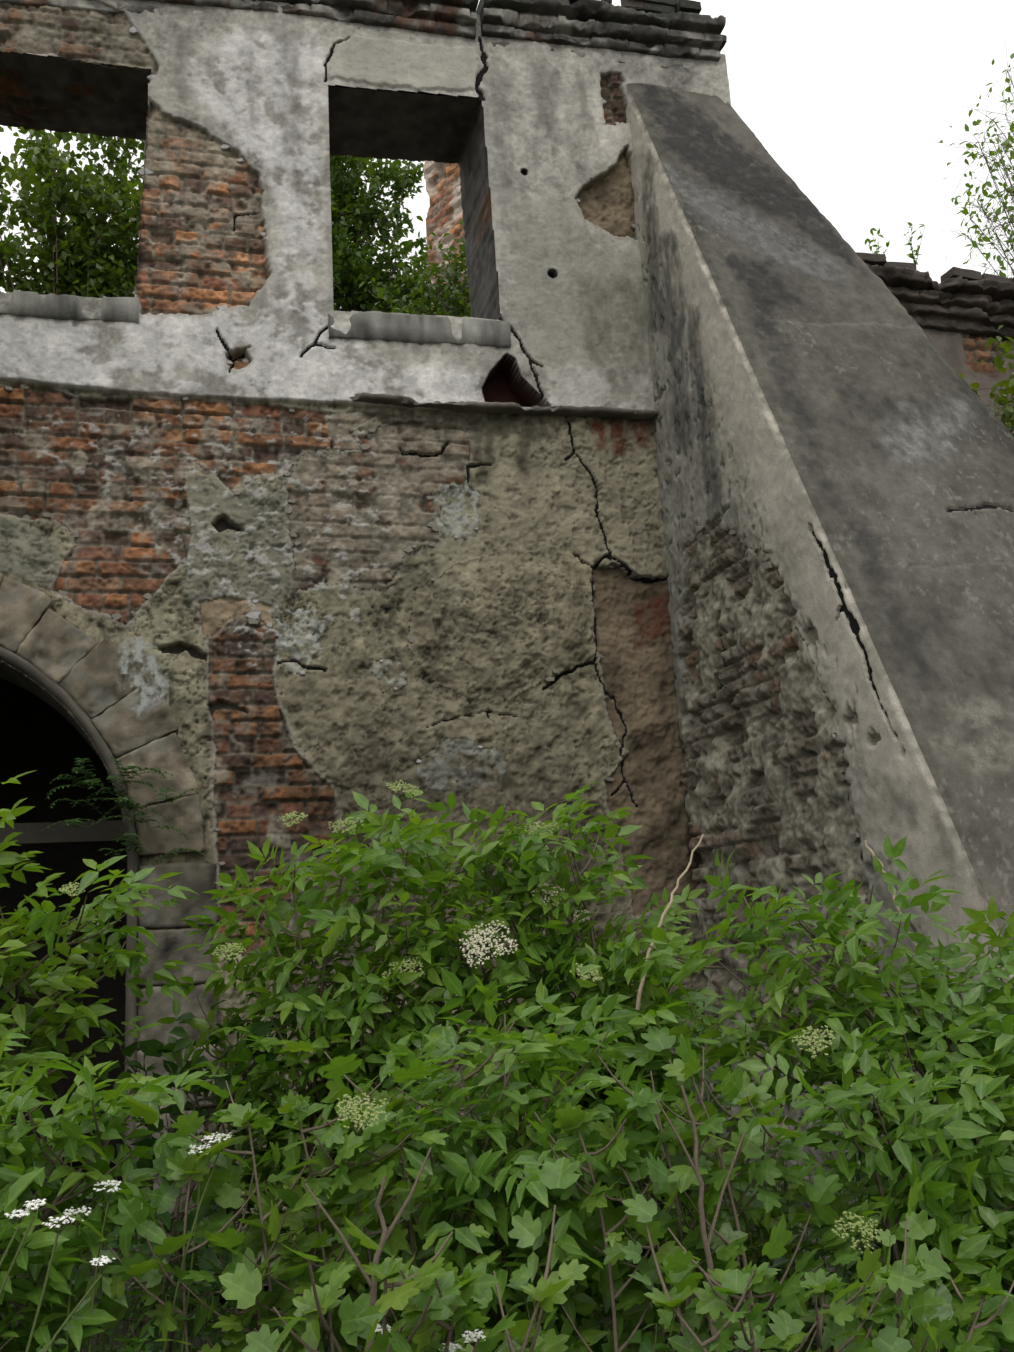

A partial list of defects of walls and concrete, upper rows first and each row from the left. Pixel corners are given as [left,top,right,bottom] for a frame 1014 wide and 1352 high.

flaking render [136,102,270,315]
crack [475,38,488,100]
flaking render [575,151,636,239]
flaking render [600,73,627,125]
crack [216,330,245,373]
crack [300,327,334,358]
crack [499,317,544,400]
flaking render [0,383,481,623]
crack [542,421,668,807]
crack [812,531,898,737]
flaking render [199,597,336,957]
flaking render [593,519,869,1070]